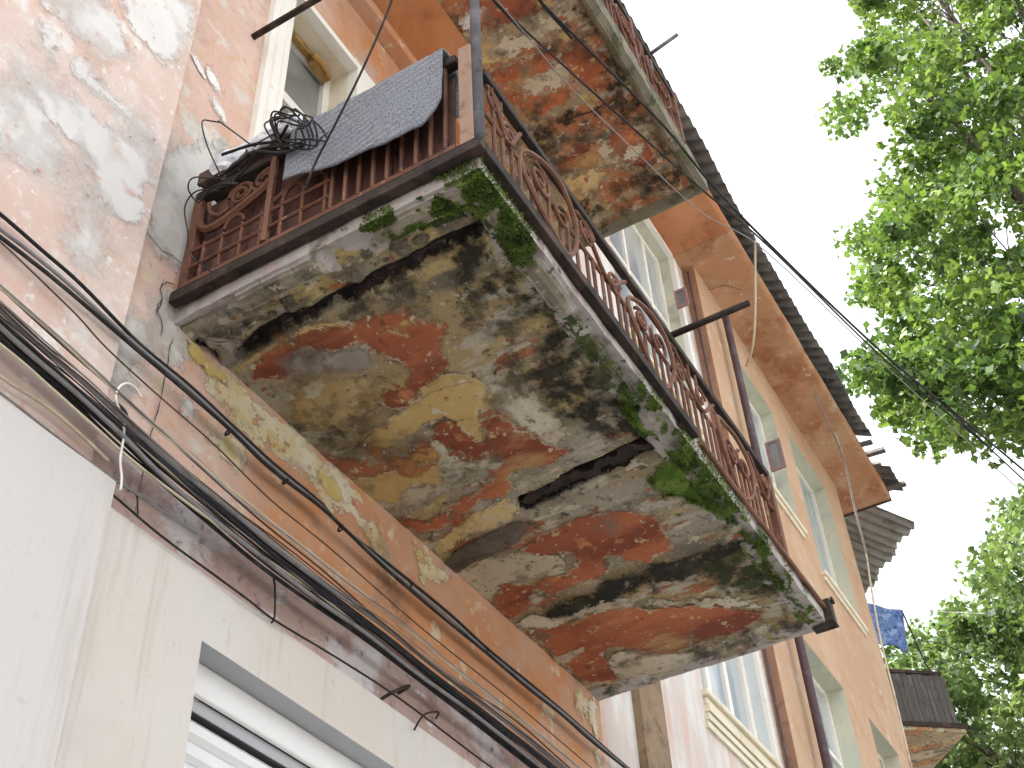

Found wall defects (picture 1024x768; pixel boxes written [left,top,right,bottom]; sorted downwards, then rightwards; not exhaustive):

peeling [0,0,227,275]
peeling [455,0,618,116]
peeling [555,123,663,204]
leakage [429,222,641,442]
peeling [111,220,772,684]
leakage [546,540,780,619]